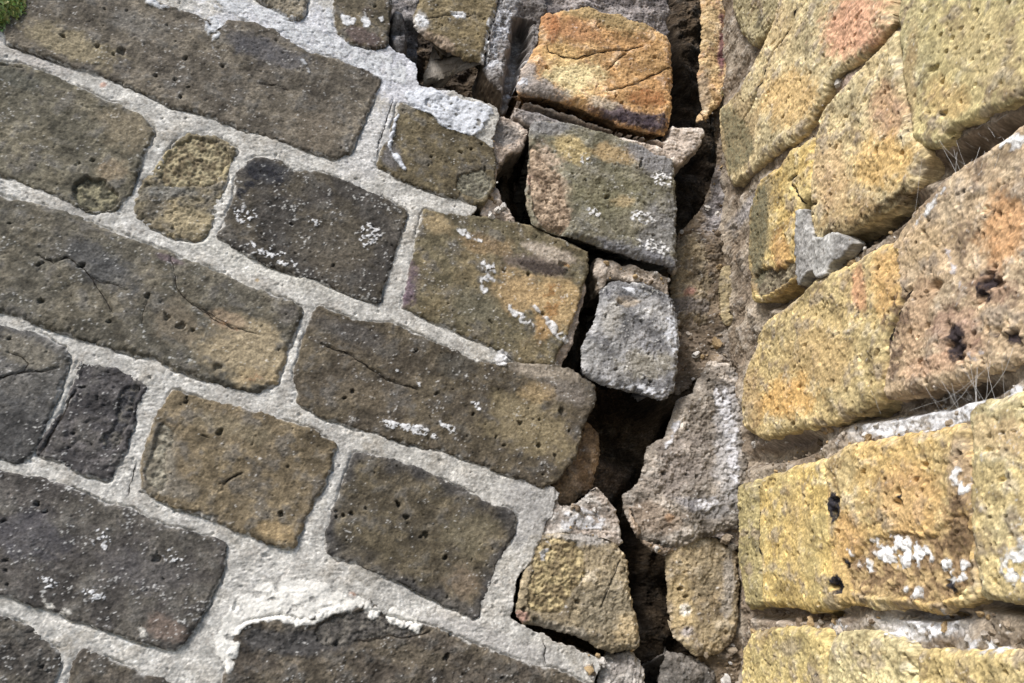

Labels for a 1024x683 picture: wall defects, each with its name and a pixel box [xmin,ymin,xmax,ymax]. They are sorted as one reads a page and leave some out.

crack [389,0,473,91]
crack [545,0,717,238]
crack [496,155,525,218]
crack [170,258,256,334]
crack [659,268,671,297]
crack [323,345,417,390]
crack [561,307,596,371]
leakage [949,467,971,494]
crack [510,380,696,664]
leakage [847,535,969,583]
leakage [903,586,924,598]
spalling [316,611,423,648]